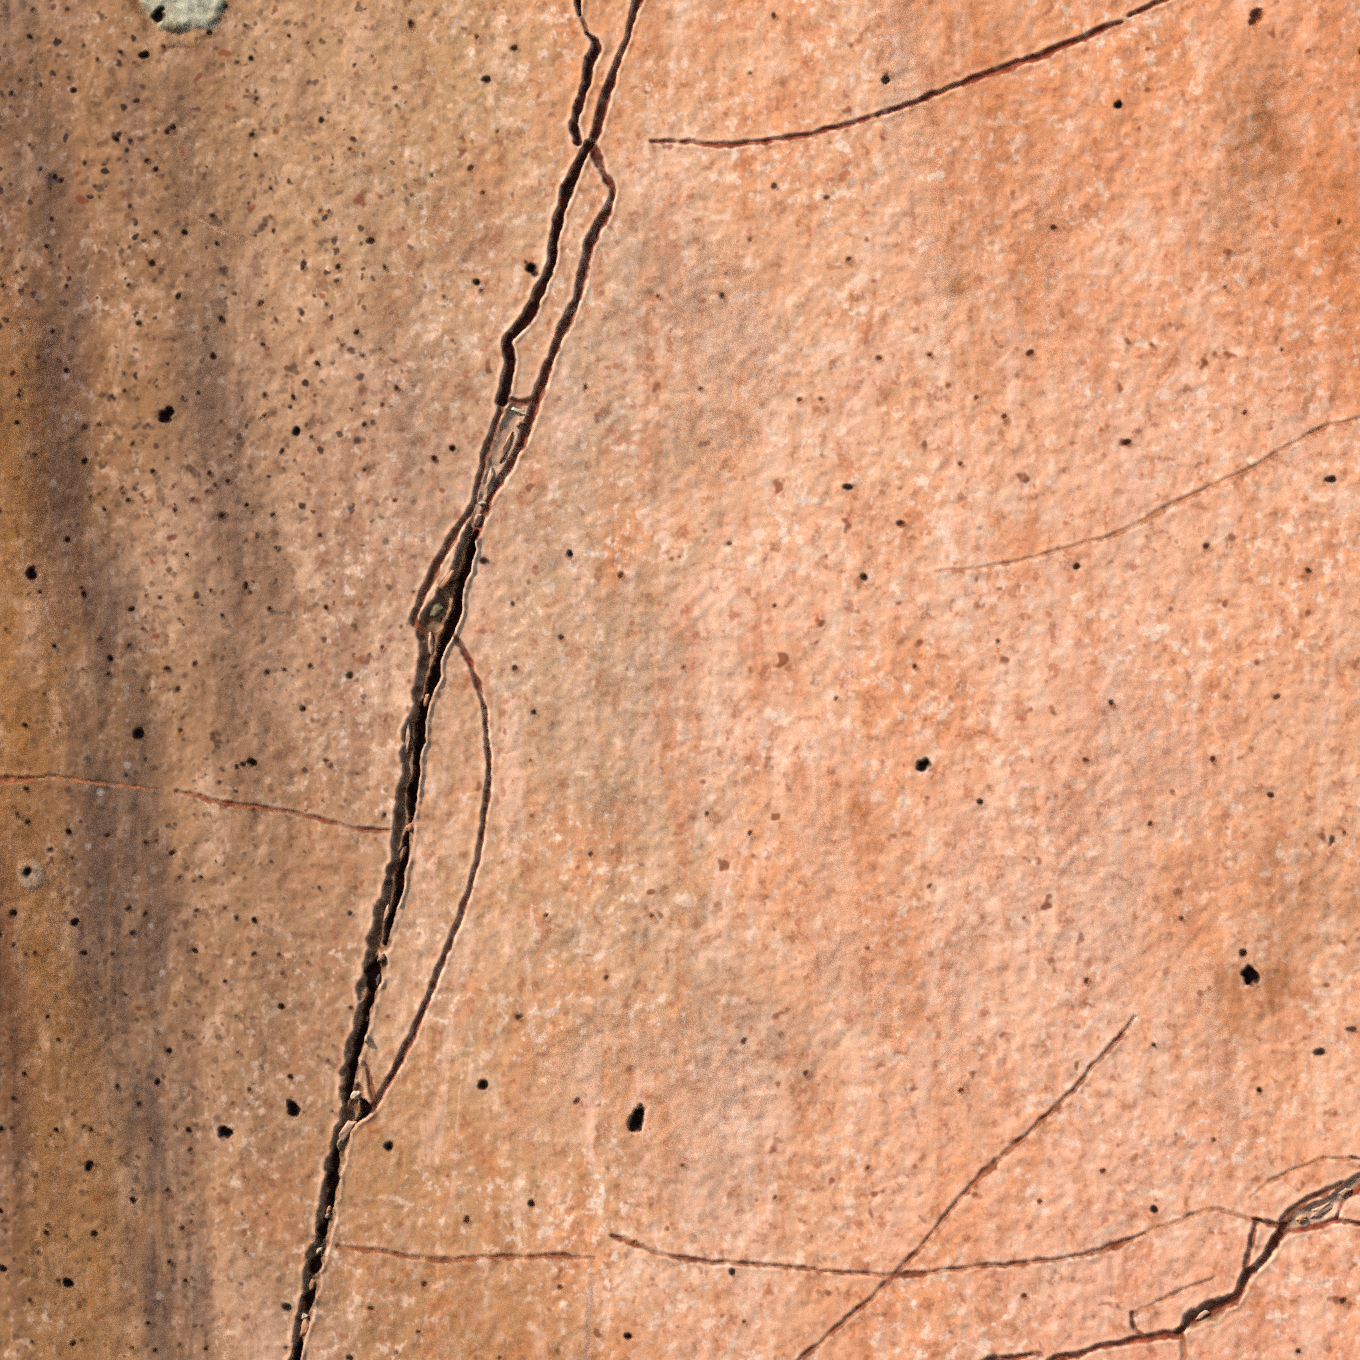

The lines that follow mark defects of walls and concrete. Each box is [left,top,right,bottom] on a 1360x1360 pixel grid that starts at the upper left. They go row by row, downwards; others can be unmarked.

crack [650,0,1167,148]
crack [0,0,643,1360]
leakage [81,735,146,1005]
crack [611,1021,1133,1360]
crack [987,1157,1360,1360]